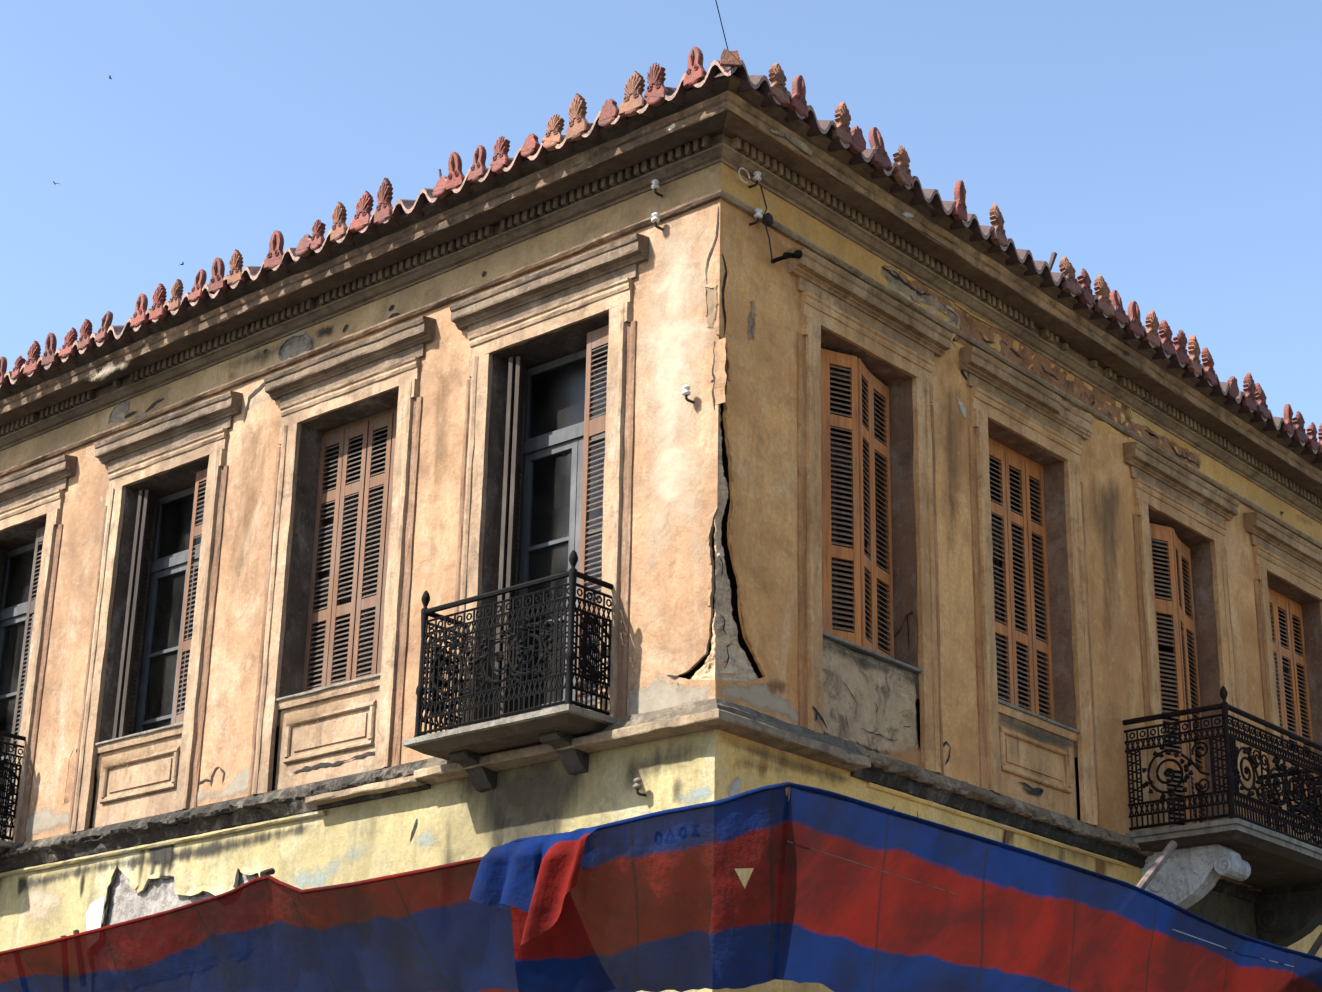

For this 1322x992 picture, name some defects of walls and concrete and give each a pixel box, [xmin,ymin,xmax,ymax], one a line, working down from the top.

spalling [679,403,761,682]
spalling [823,642,918,755]
leakage [18,825,303,896]
peeling [28,890,59,918]
peeling [86,865,266,931]